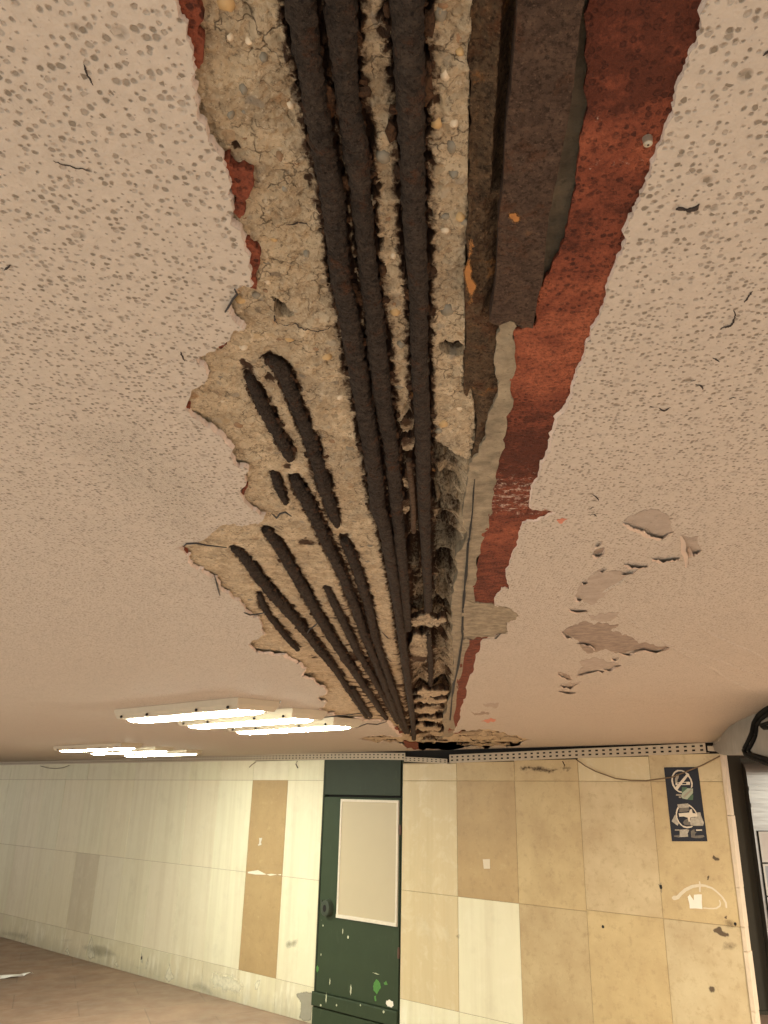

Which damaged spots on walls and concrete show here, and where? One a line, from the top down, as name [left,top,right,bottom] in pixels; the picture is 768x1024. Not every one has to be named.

spalling [175,0,534,750]
rust [464,240,476,302]
peeling [473,0,707,605]
peeling [557,509,702,694]